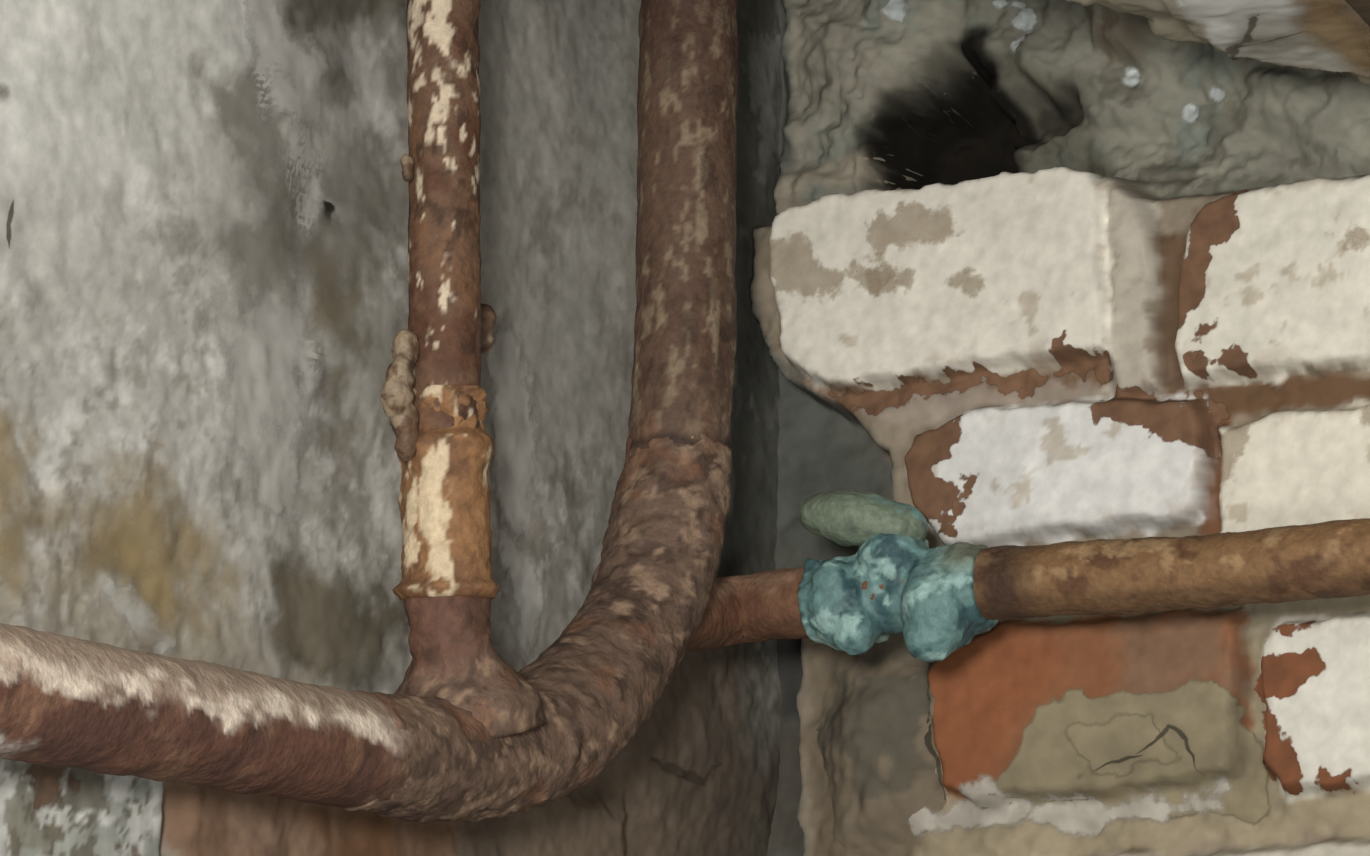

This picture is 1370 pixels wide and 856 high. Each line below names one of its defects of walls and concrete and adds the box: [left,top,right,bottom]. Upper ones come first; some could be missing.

spalling [867,38,1033,190]
damp [993,0,1037,51]
damp [1123,68,1140,87]
damp [1182,87,1225,122]
crack [1226,15,1306,60]
damp [212,72,383,517]
peeling [828,187,1257,460]
peeling [904,410,977,537]
damp [266,554,408,685]
peeling [28,764,80,809]
crack [1092,725,1202,774]
peeling [1254,621,1358,795]